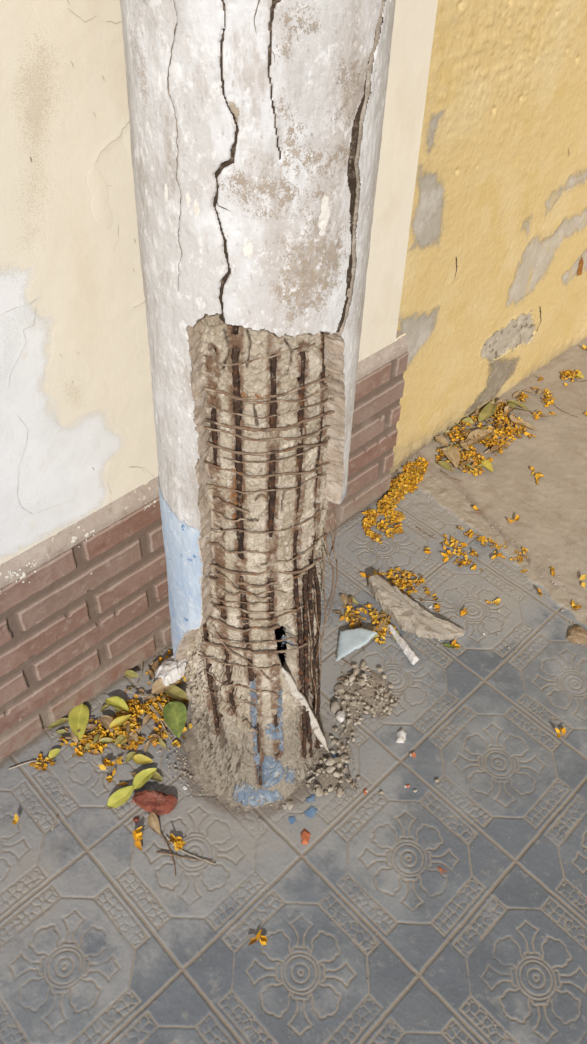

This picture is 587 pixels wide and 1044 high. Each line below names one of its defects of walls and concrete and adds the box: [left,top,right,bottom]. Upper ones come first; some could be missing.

peeling [0,259,128,563]
crack [167,0,182,285]
crack [213,0,239,324]
spalling [175,313,345,808]
crack [254,0,281,160]
peeling [336,627,377,661]
crack [336,0,386,333]
peeling [480,161,587,363]